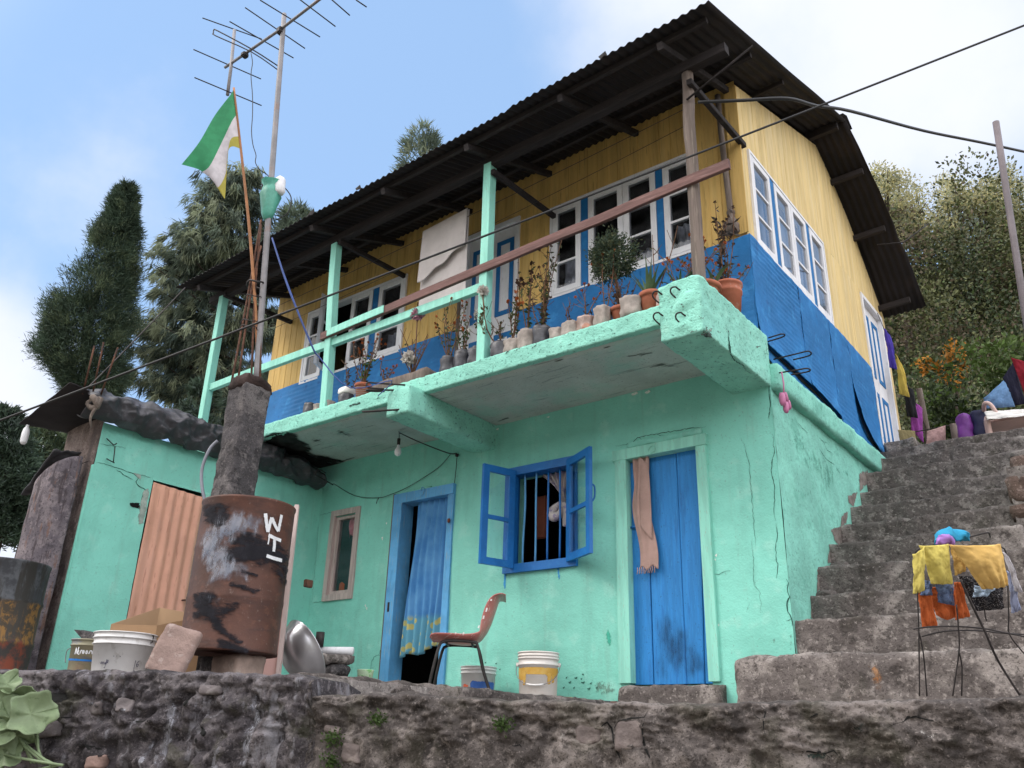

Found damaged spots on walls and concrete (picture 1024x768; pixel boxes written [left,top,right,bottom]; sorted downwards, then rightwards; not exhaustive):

crack [82,444,150,499]
crack [717,396,793,623]
peeling [811,470,868,619]